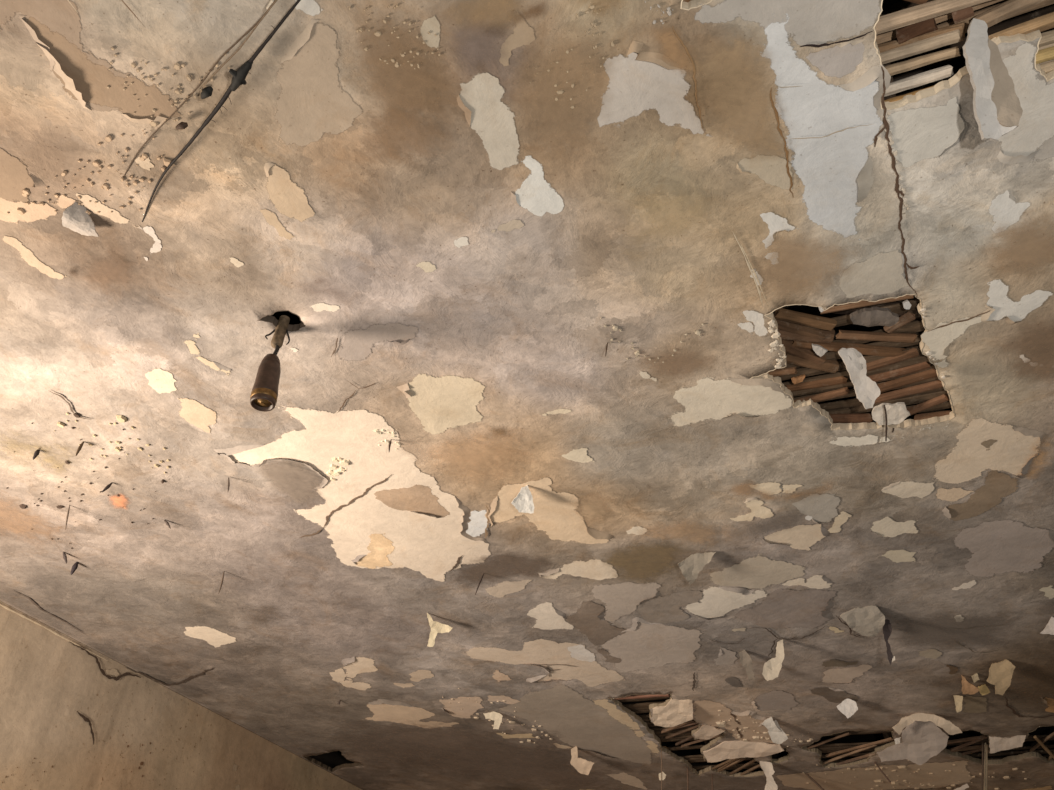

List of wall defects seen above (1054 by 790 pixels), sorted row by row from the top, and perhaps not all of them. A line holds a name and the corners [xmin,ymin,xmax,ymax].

peeling [457,11,564,216]
peeling [597,41,712,137]
crack [770,66,920,294]
peeling [736,0,969,241]
peeling [668,250,1053,447]
crack [927,310,990,332]
peeling [213,406,613,582]
peeling [881,418,1045,502]
crack [77,711,95,745]
crack [0,590,214,686]
peeling [184,626,237,648]
peeling [362,552,1054,790]